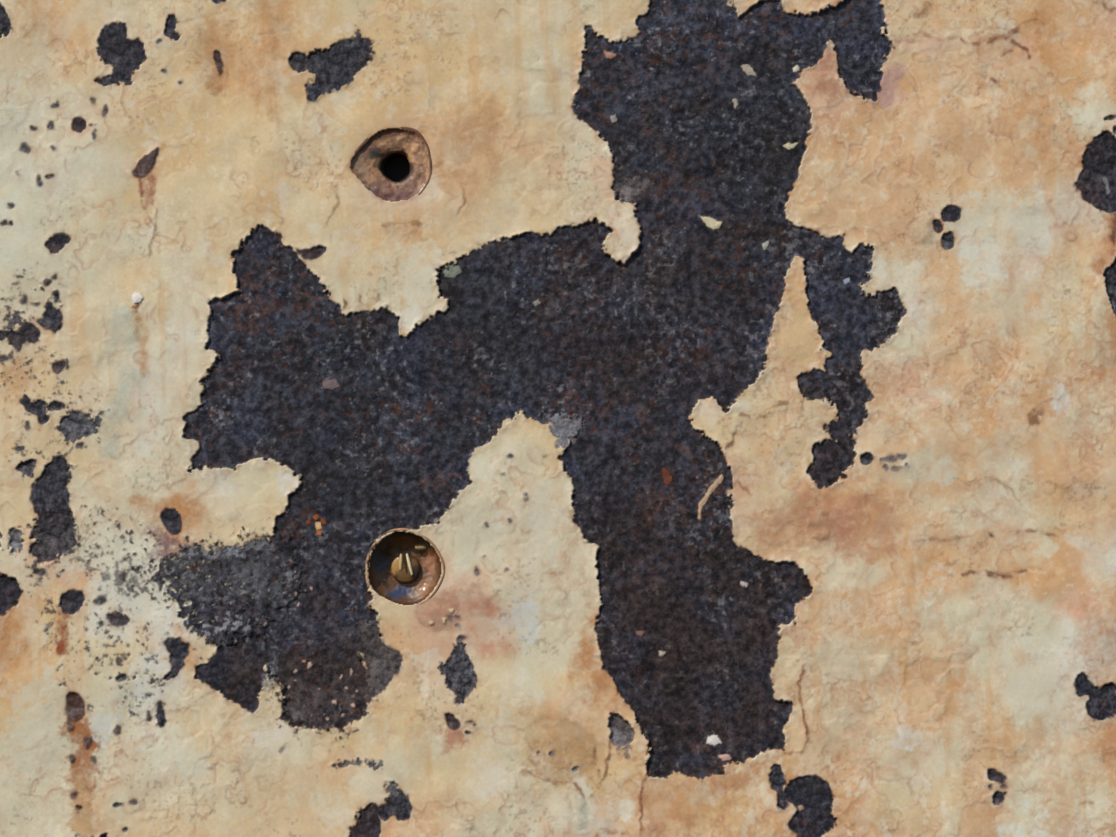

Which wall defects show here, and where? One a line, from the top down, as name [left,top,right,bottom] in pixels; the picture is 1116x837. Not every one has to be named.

rust [877,68,902,108]
peeling [1075,116,1116,213]
peeling [1103,258,1116,314]
peeling [0,0,909,779]
peeling [1074,672,1116,720]
rust [66,693,100,836]
peeling [349,781,412,837]
peeling [769,764,837,837]